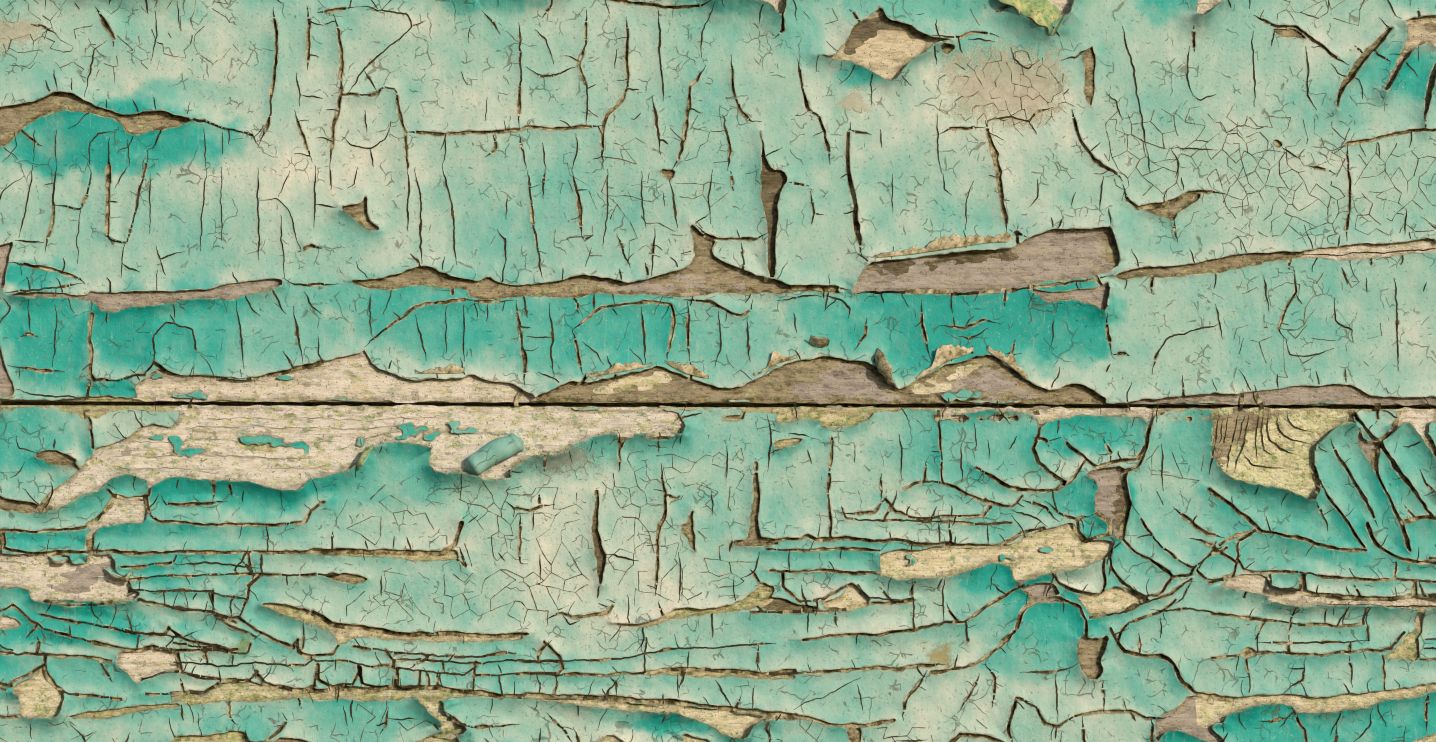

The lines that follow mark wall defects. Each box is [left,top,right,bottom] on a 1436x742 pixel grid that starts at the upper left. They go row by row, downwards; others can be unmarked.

peeling [759,0,797,23]
peeling [816,8,954,86]
peeling [1196,0,1231,14]
peeling [1331,6,1436,116]
crack [0,0,1436,398]
peeling [352,134,1436,318]
peeling [0,242,1436,742]
crack [1146,443,1224,538]
crack [1317,441,1378,529]
crack [335,416,1171,742]
crack [1151,581,1227,638]
crack [1258,609,1373,742]